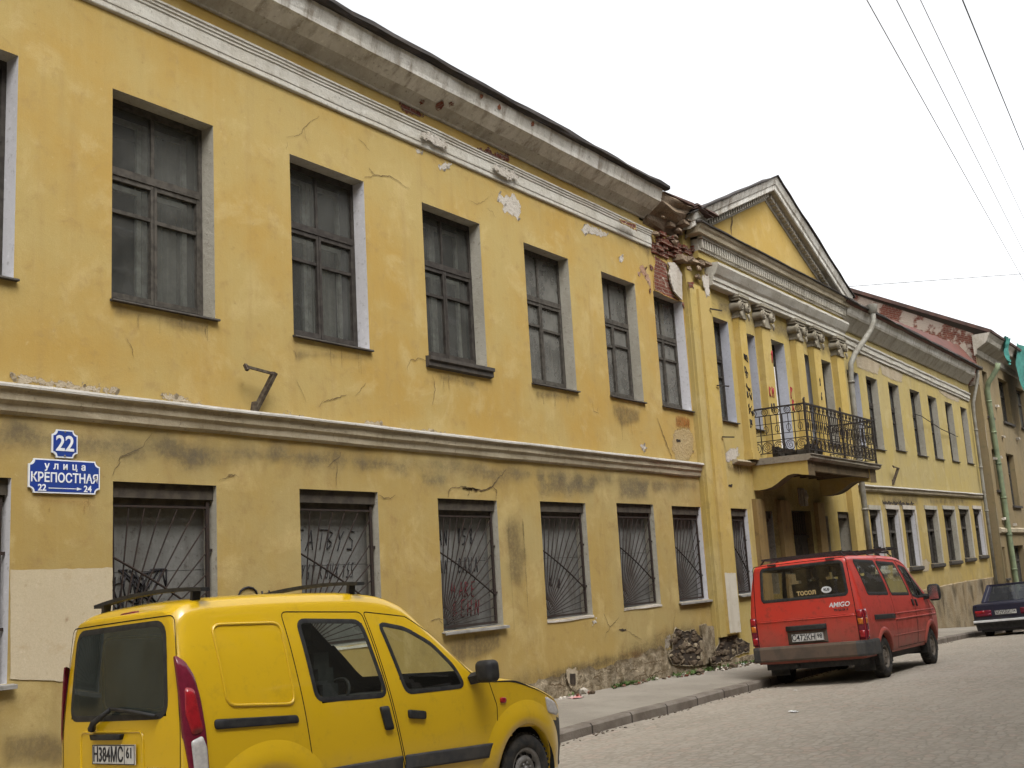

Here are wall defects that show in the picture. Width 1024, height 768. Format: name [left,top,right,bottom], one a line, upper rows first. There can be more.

peeling [497,191,521,220]
peeling [581,224,608,238]
spalling [638,245,710,309]
crack [448,471,505,497]
spalling [528,624,754,699]